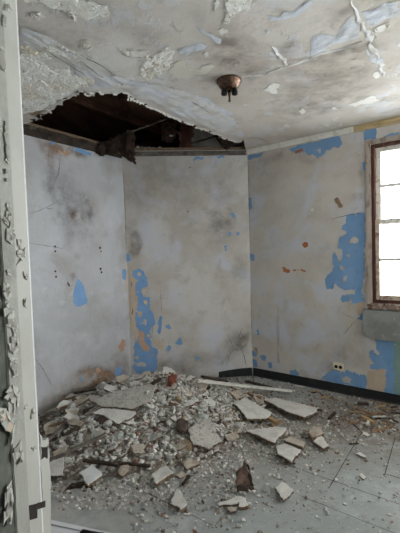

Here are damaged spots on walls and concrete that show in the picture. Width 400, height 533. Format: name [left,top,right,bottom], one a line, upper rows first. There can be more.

peeling [20,43,244,143]
peeling [348,95,379,107]
peeling [58,148,91,156]
peeling [289,136,343,158]
peeling [3,283,19,378]
peeling [2,203,26,276]
peeling [67,279,88,307]
peeling [122,254,183,374]
peeling [325,213,367,320]
peeling [321,340,400,395]
peeling [0,385,35,463]
peeling [3,480,14,525]